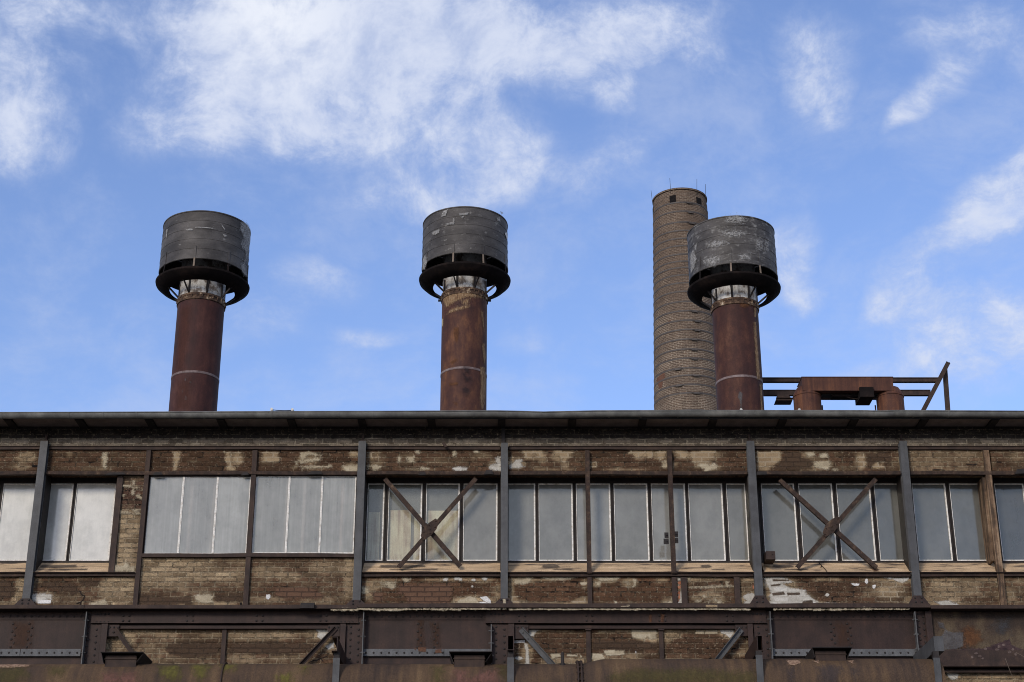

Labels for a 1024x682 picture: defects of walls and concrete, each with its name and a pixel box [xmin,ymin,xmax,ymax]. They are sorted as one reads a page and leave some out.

corrosion [442,293,483,326]
peeling [224,451,242,470]
peeling [262,452,279,462]
peeling [295,452,331,469]
peeling [489,450,574,471]
peeling [629,450,716,463]
peeling [756,450,781,467]
peeling [806,452,838,471]
peeling [764,577,908,611]